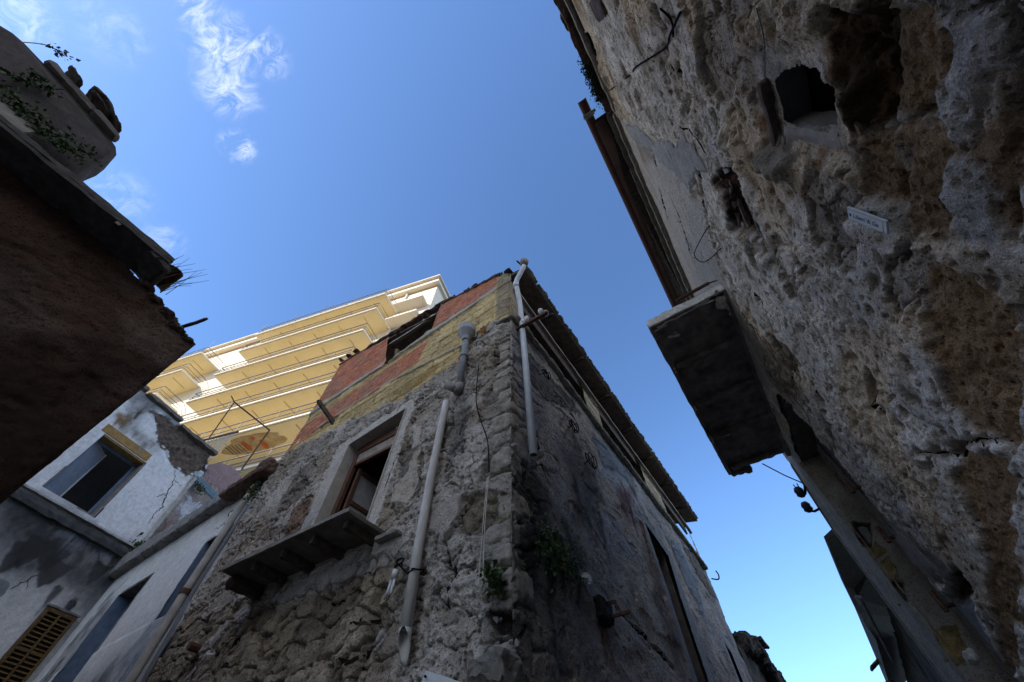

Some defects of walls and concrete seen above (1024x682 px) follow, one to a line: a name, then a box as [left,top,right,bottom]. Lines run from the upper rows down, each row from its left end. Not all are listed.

crack [150,472,181,520]
spalling [150,410,288,520]
crack [919,437,1013,457]
damp [0,503,119,682]